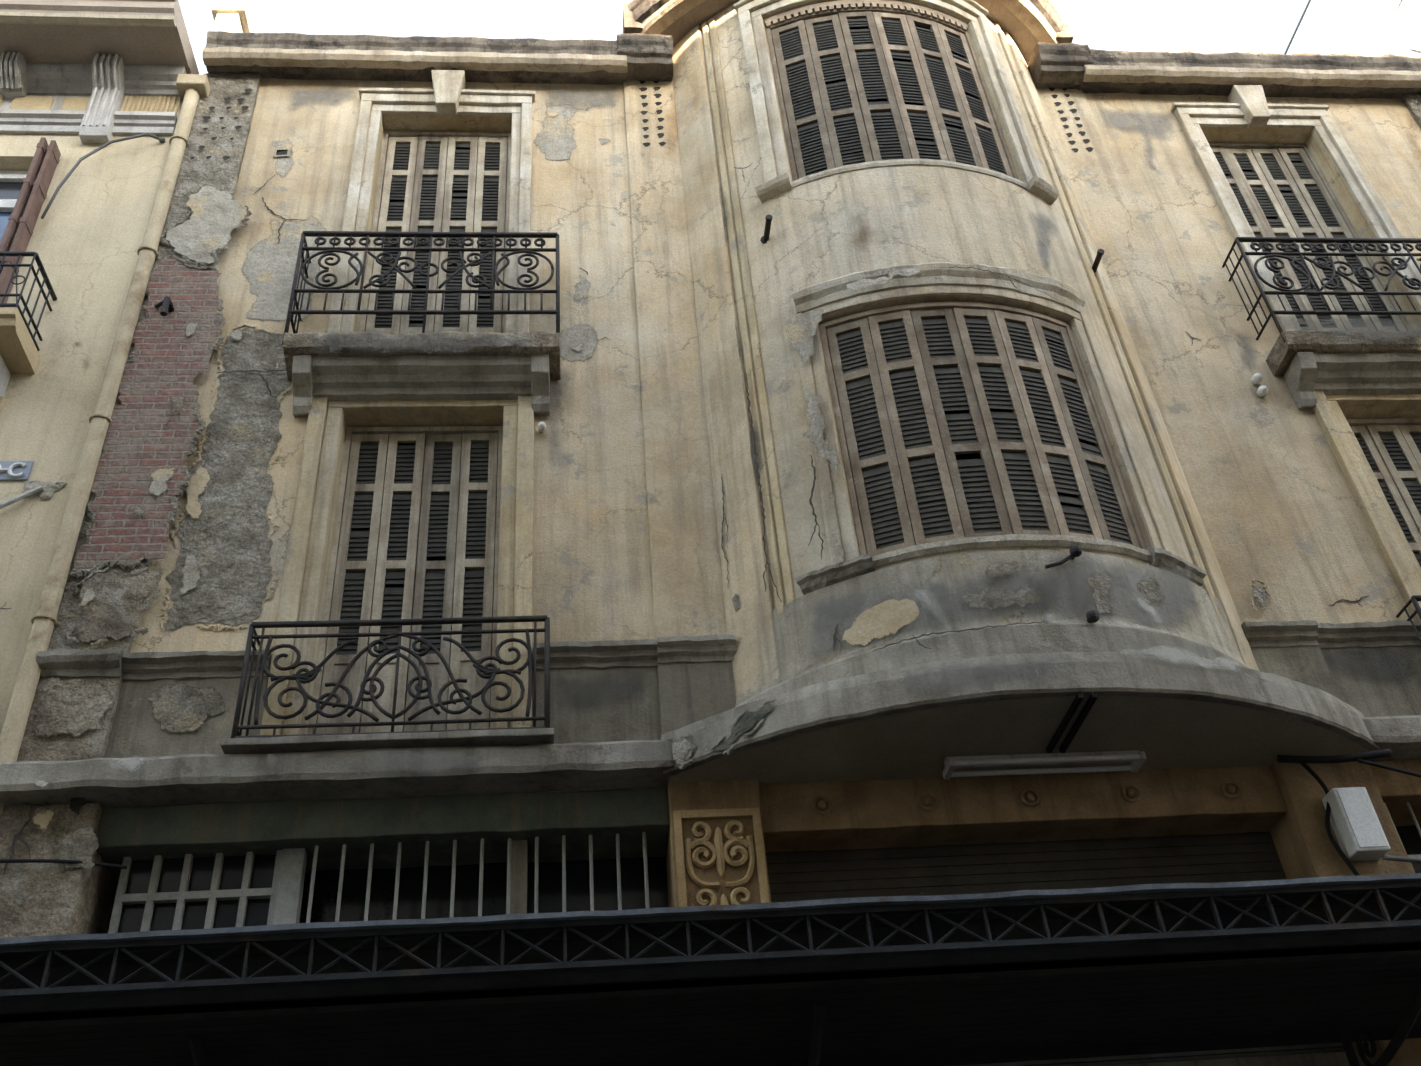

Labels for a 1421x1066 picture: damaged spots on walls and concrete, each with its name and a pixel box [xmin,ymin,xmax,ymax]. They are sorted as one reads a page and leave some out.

hole [272,140,294,177]
flaking render [65,182,332,646]
crack [721,476,729,584]
crack [745,373,782,602]
crack [808,455,824,559]
peeling [842,599,919,646]
spalling [33,676,113,737]
spalling [146,682,225,733]
spalling [666,698,776,770]
spalling [32,798,99,870]